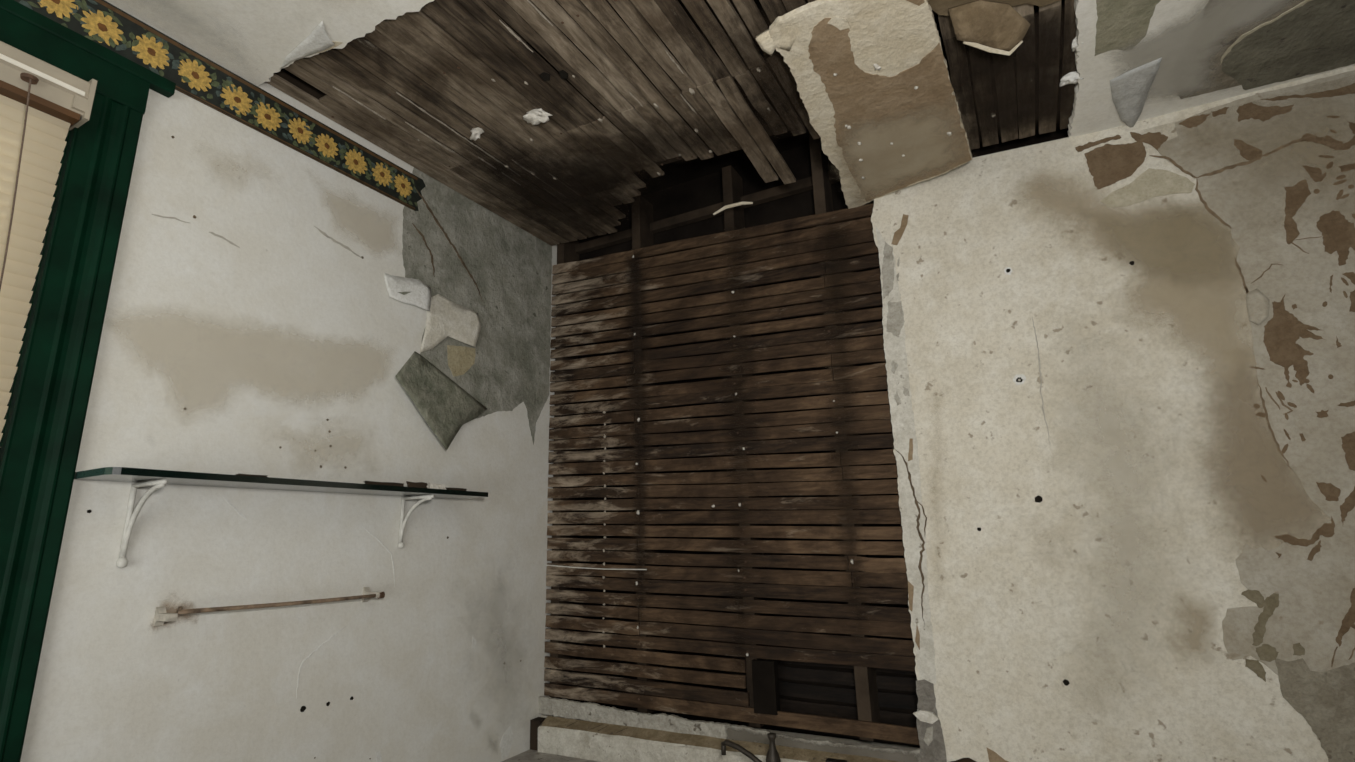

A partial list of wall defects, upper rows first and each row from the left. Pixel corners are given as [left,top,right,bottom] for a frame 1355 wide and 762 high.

peeling [827,16,851,30]
water stain [1273,125,1339,175]
water stain [125,315,383,410]
peeling [402,167,552,445]
peeling [538,214,947,762]
crack [896,450,927,621]
water stain [1031,182,1313,533]
peeling [1075,0,1355,762]